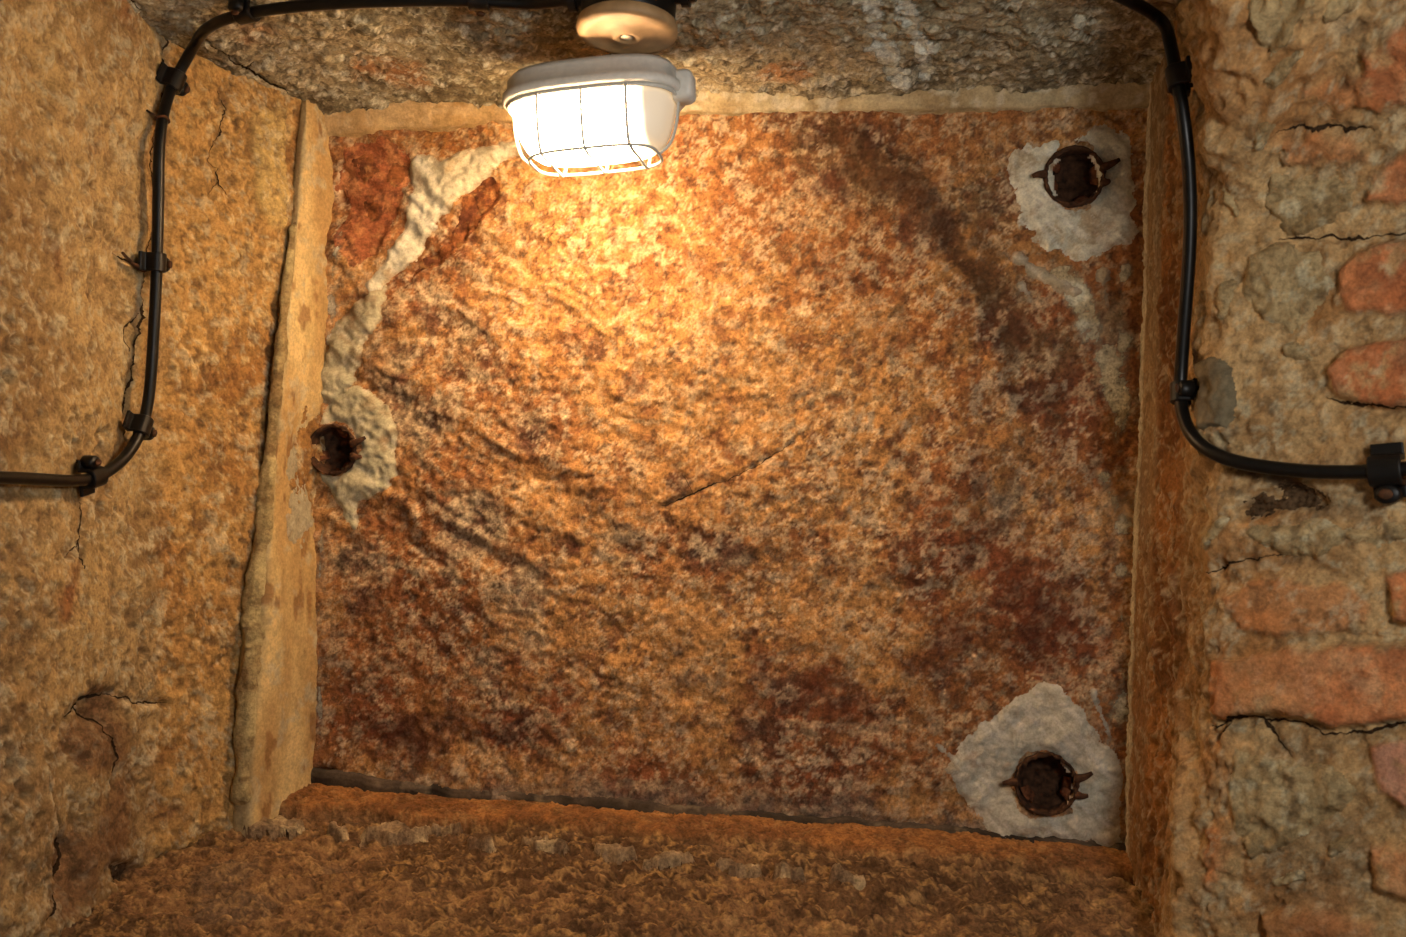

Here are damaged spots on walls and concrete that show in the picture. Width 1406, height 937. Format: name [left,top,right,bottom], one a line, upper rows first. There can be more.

efflorescence [852,0,940,90]
crack [1276,123,1375,133]
crack [1278,232,1406,241]
water stain [321,285,388,405]
crack [1326,396,1406,409]
crack [1212,715,1406,757]